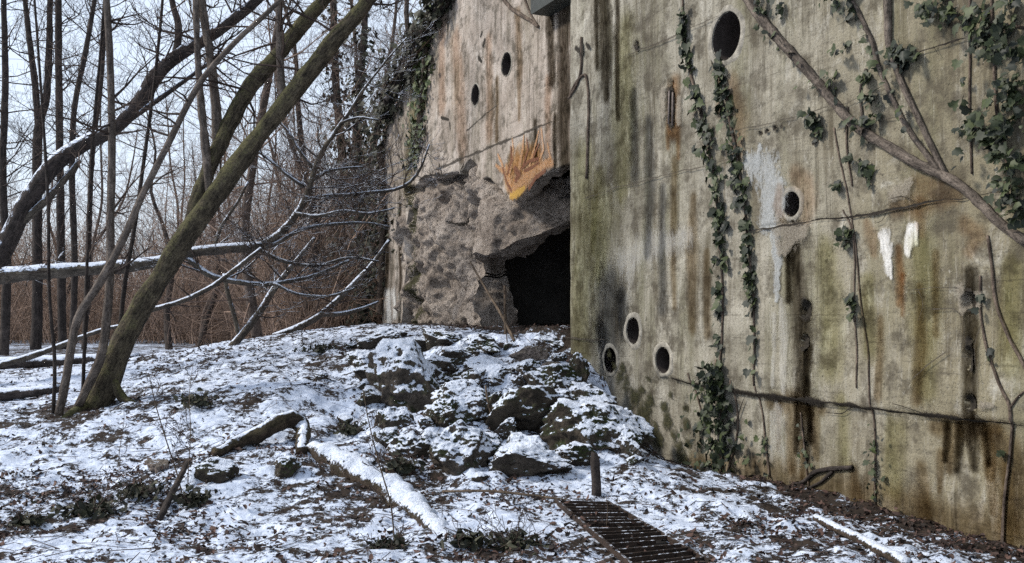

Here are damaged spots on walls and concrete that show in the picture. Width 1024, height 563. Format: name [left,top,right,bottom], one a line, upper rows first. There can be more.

spalling [385,165,571,327]
water stain [744,143,812,463]
water stain [943,267,990,472]